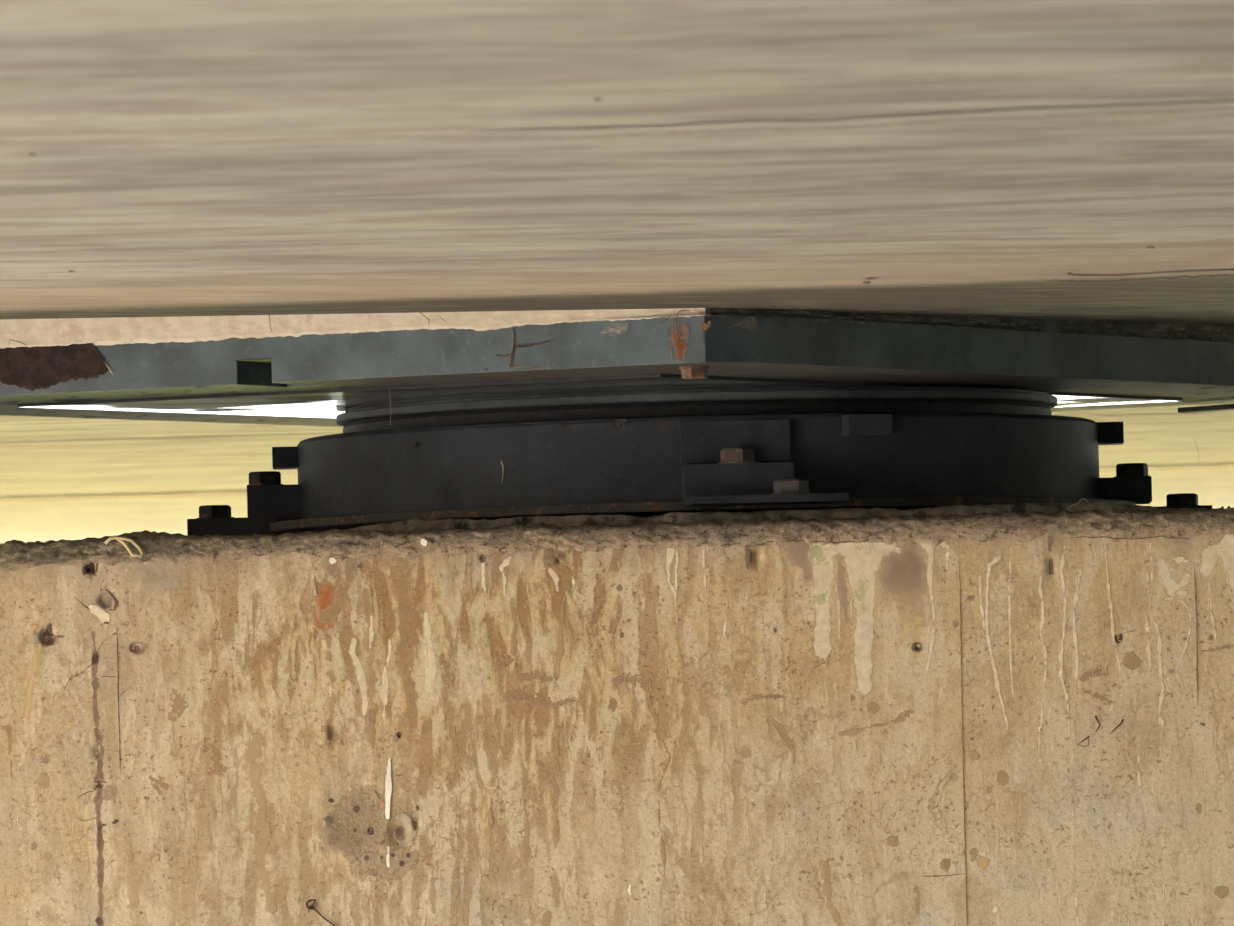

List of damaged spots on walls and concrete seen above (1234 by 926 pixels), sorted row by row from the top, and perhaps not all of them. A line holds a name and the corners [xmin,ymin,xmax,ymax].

crack [498,326,549,367]
corrosion [314,575,339,635]
leakage [320,634,344,747]
leakage [349,560,463,771]
leakage [481,556,576,710]
leakage [666,547,679,618]
leakage [784,541,950,695]
leakage [978,555,1014,730]
leakage [1027,545,1122,760]
leakage [1149,534,1234,732]
leakage [243,733,276,913]
leakage [518,724,564,861]